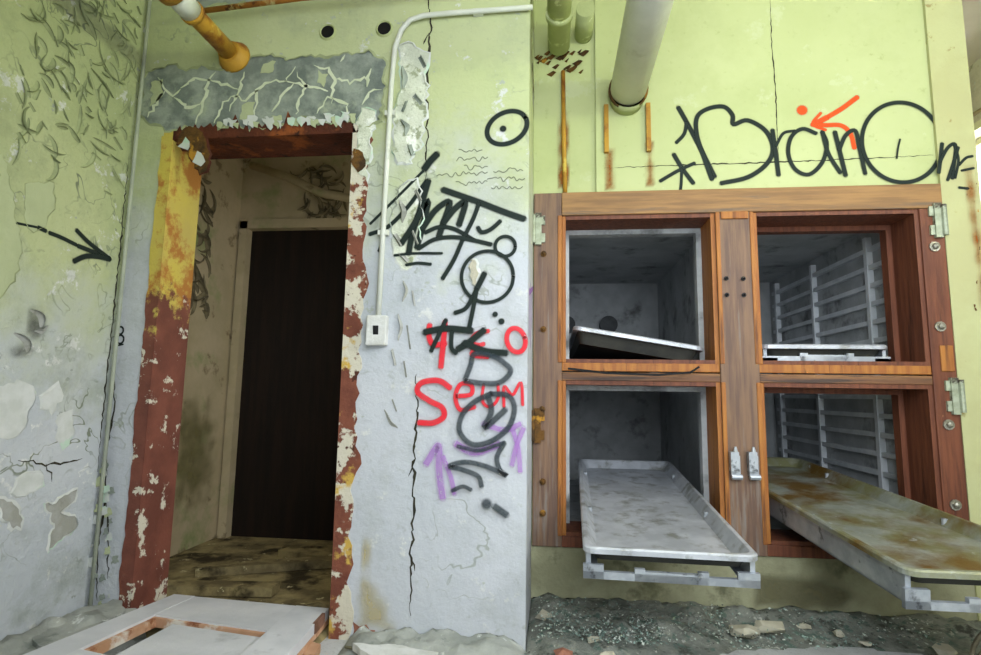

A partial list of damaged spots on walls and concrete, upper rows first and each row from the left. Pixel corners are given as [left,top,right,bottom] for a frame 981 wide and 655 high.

peeling [0,0,431,322]
peeling [0,470,45,532]
spalling [43,487,78,553]
crack [18,157,129,598]
peeling [391,314,411,377]
crack [408,376,419,615]